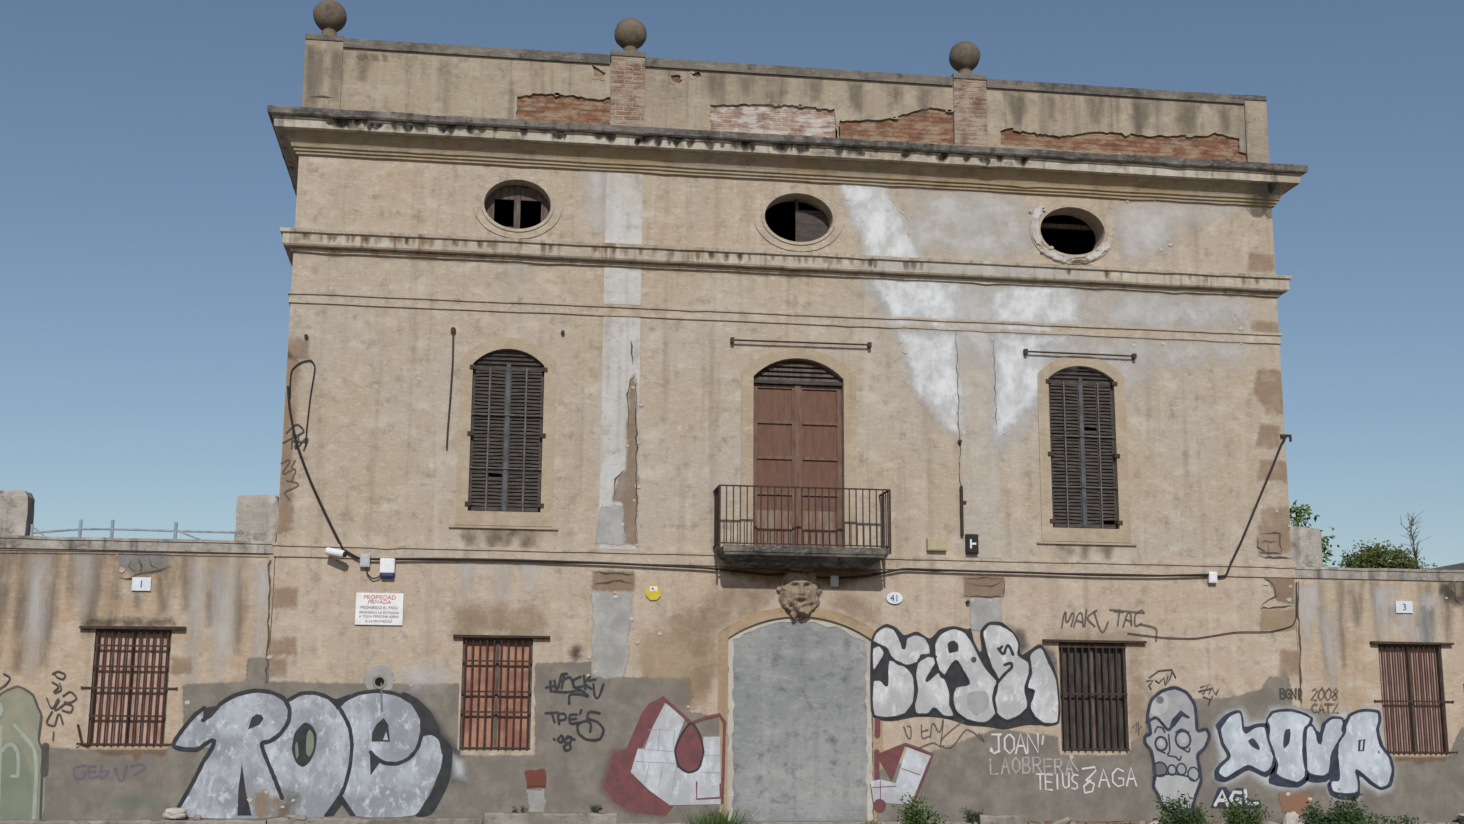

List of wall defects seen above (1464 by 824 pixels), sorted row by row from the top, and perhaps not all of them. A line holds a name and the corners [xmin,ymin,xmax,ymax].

flaking render [516,68,610,125]
flaking render [710,102,954,145]
flaking render [1000,127,1246,161]
peeling [613,377,644,546]
water stain [29,567,44,636]
water stain [1297,588,1333,662]